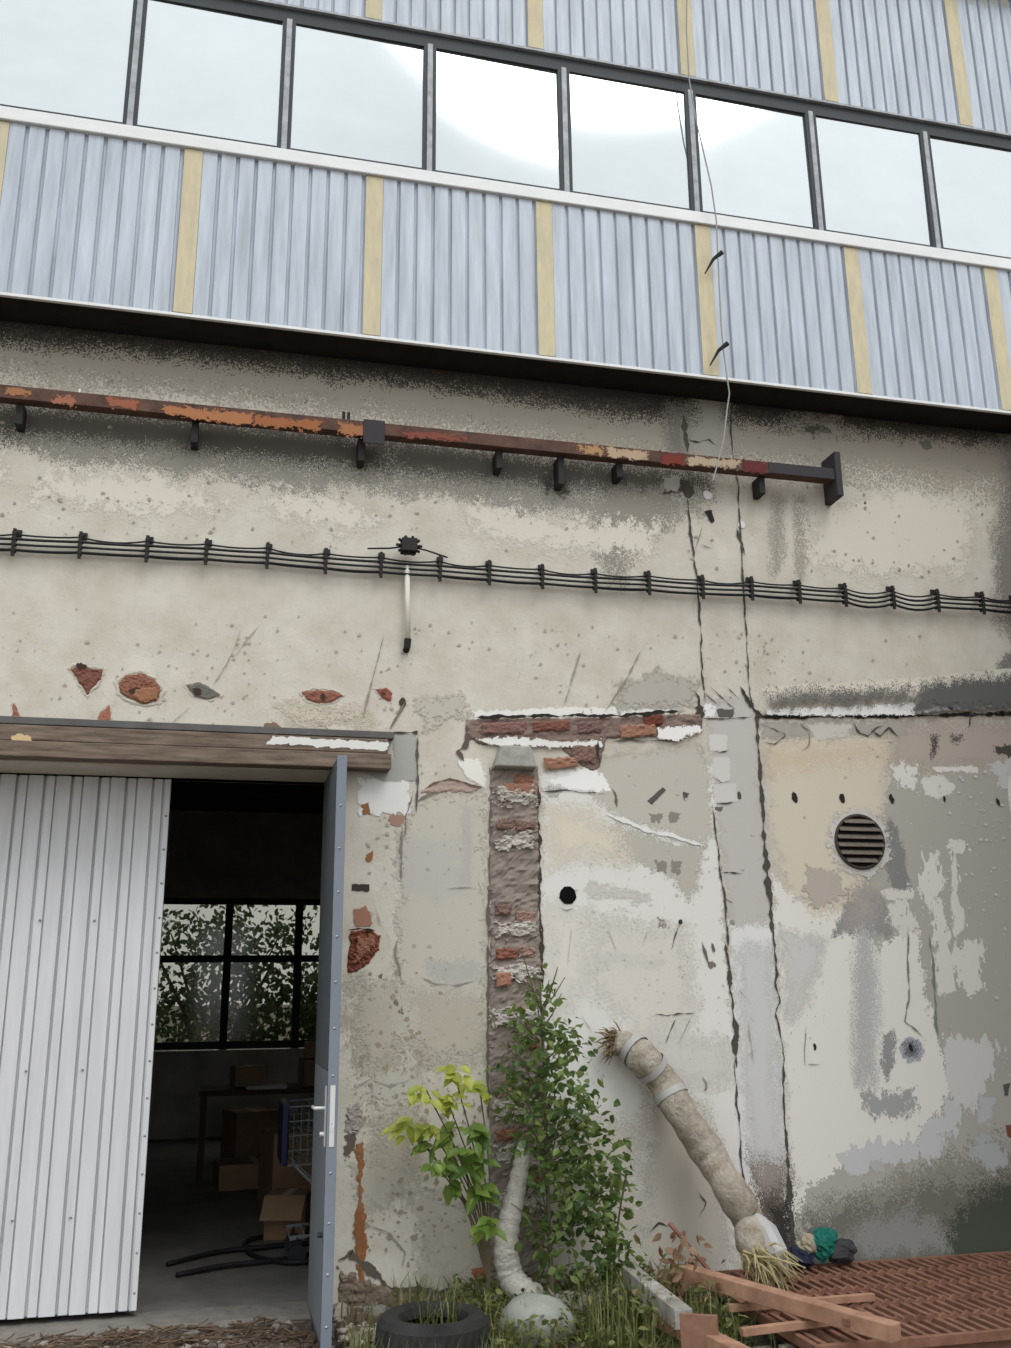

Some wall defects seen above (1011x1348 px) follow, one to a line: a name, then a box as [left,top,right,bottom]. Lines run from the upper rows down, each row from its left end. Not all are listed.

corrosion [4,385,32,399]
corrosion [50,394,77,408]
corrosion [105,396,140,411]
corrosion [162,404,363,438]
corrosion [399,429,470,442]
corrosion [577,444,769,475]
spalling [67,662,224,720]
spalling [299,687,345,706]
crack [350,404,820,1245]
flaking render [336,703,734,1309]